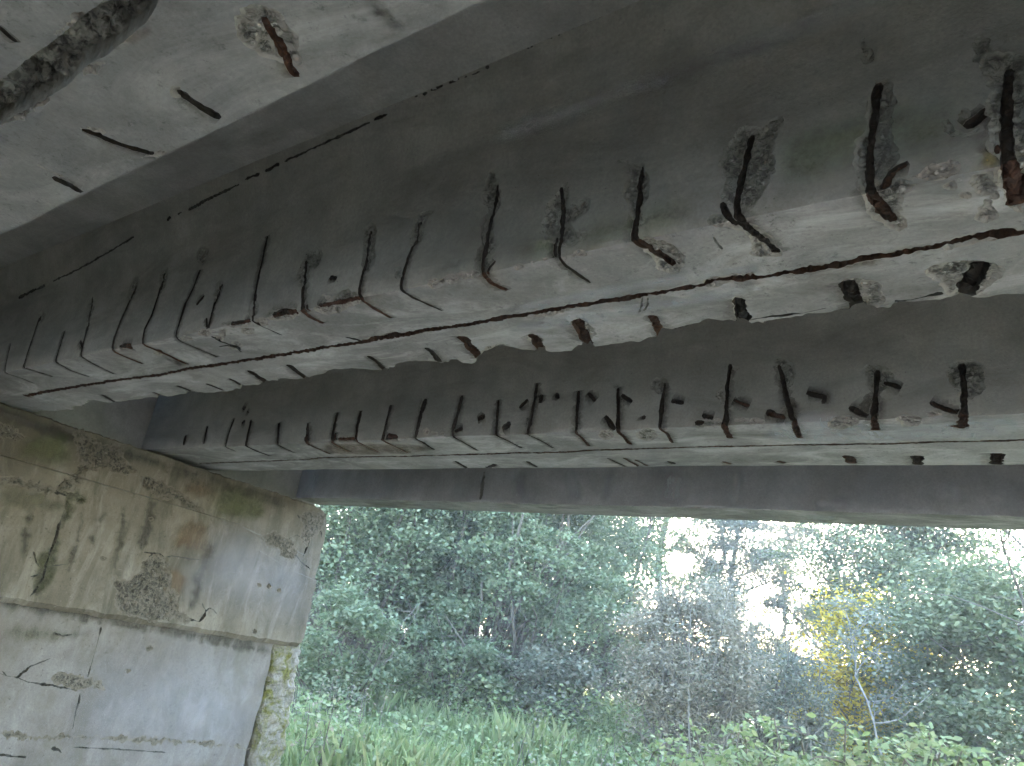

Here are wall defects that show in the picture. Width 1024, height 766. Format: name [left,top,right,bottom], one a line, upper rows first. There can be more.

spalling [234,4,302,78]
spalling [853,36,1024,232]
spalling [707,116,784,257]
crack [18,236,134,299]
crack [211,336,242,352]
spalling [454,336,510,358]
spalling [569,318,597,344]
spalling [732,296,752,322]
crack [895,292,943,302]
crack [12,458,70,596]
crack [0,627,165,753]
crack [0,752,26,760]